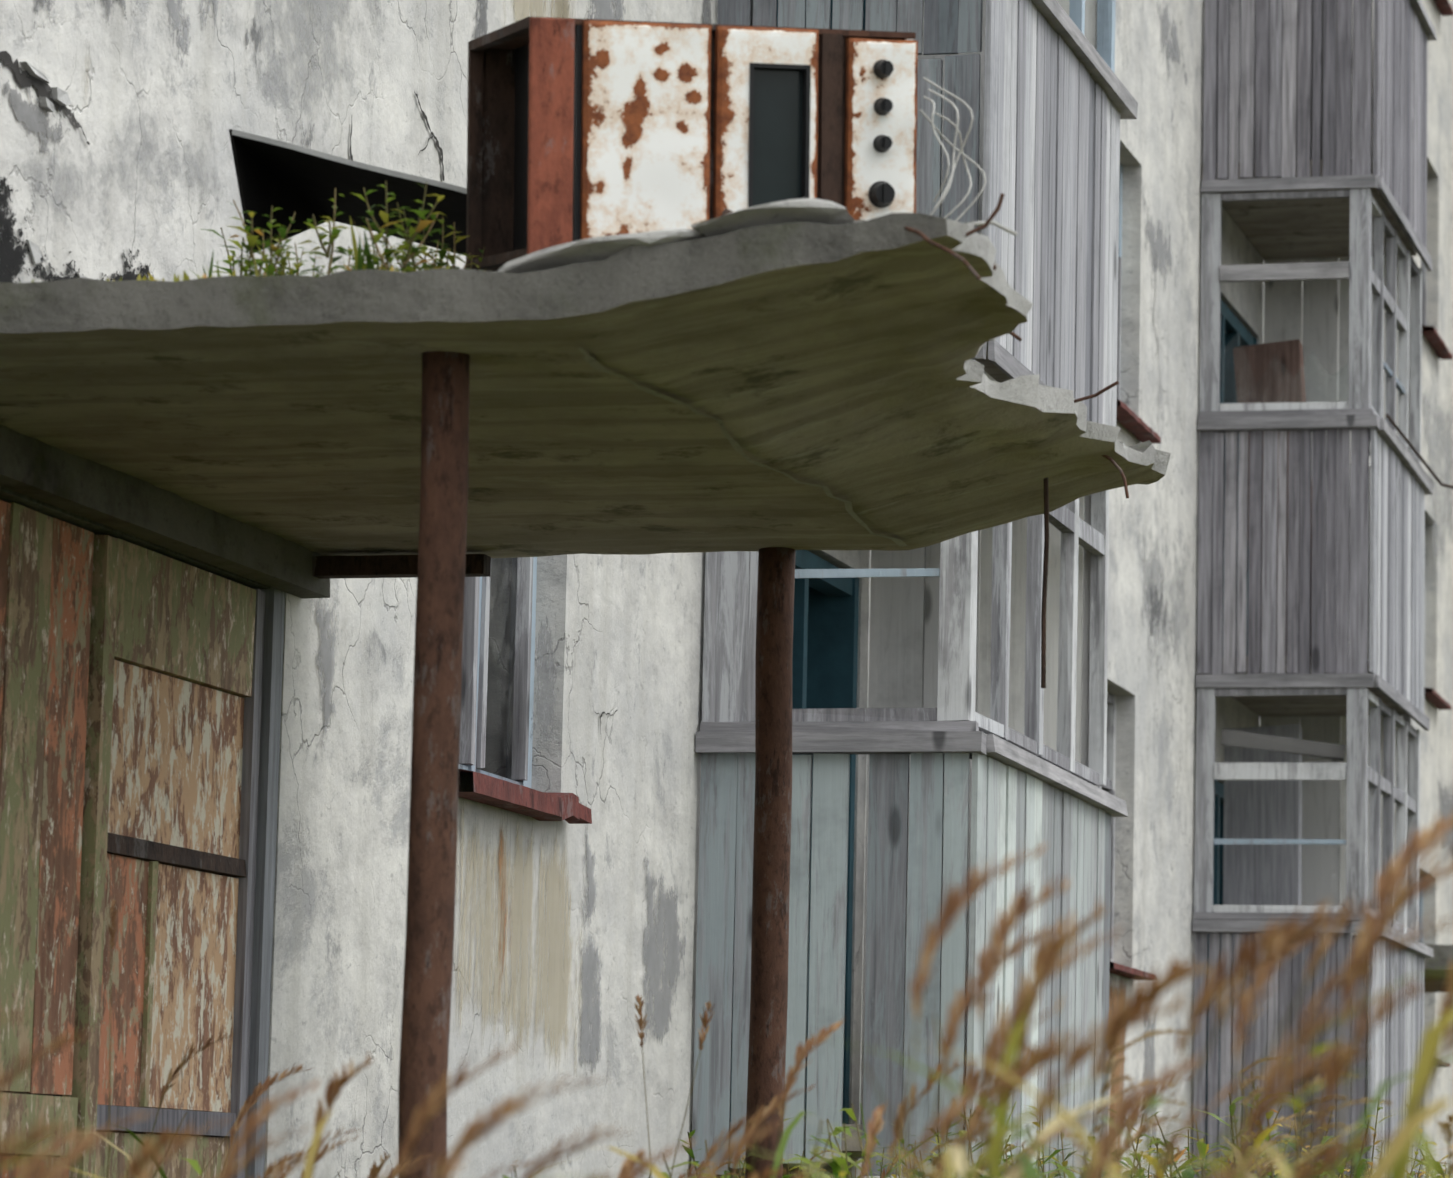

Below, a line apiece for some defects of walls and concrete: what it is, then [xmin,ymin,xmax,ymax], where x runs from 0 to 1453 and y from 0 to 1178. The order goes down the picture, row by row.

crack [0,51,90,153]
spalling [965,193,1018,237]
spalling [1074,381,1119,403]
water stain [643,861,686,1041]
corrosion [1108,976,1126,1172]